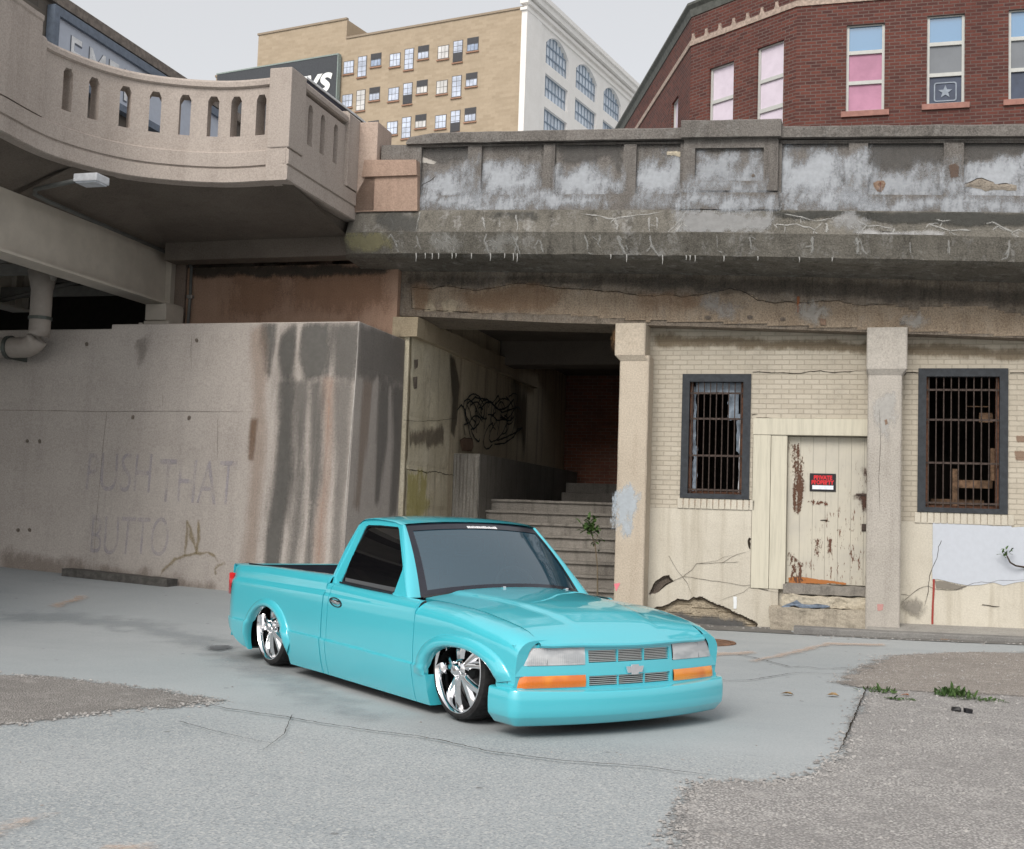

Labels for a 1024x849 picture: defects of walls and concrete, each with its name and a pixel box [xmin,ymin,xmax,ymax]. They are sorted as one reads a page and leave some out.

leakage [377,139,1024,260]
spalling [964,178,1017,192]
leakage [261,323,357,564]
spalling [649,575,673,594]
crack [670,552,780,600]
rust [788,577,846,585]
peeling [935,581,966,590]
spalling [654,597,758,627]